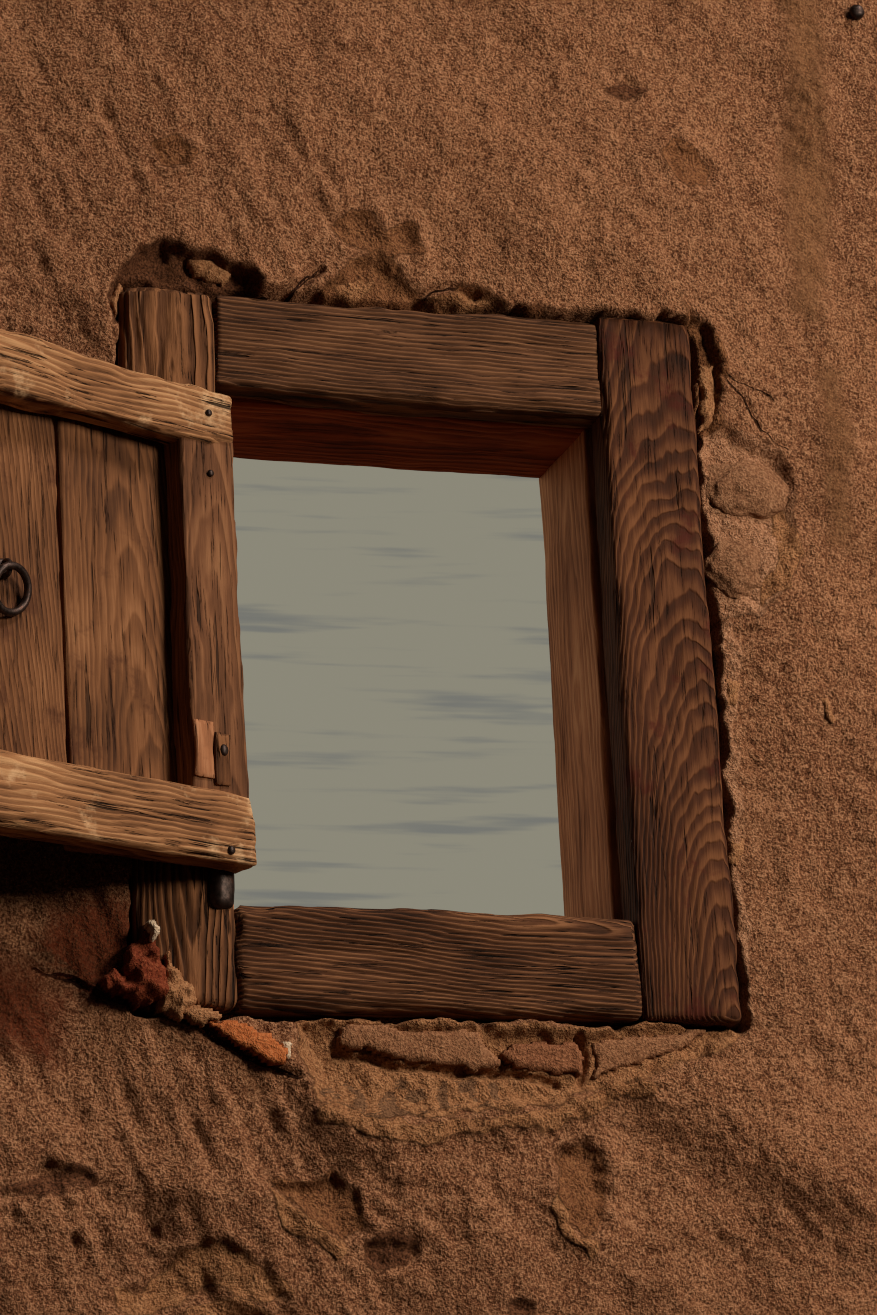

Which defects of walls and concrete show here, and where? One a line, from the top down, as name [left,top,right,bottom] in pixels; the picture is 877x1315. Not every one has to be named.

crack [258,272,316,302]
crack [422,287,472,302]
crack [726,374,789,450]
spalling [98,301,805,1145]